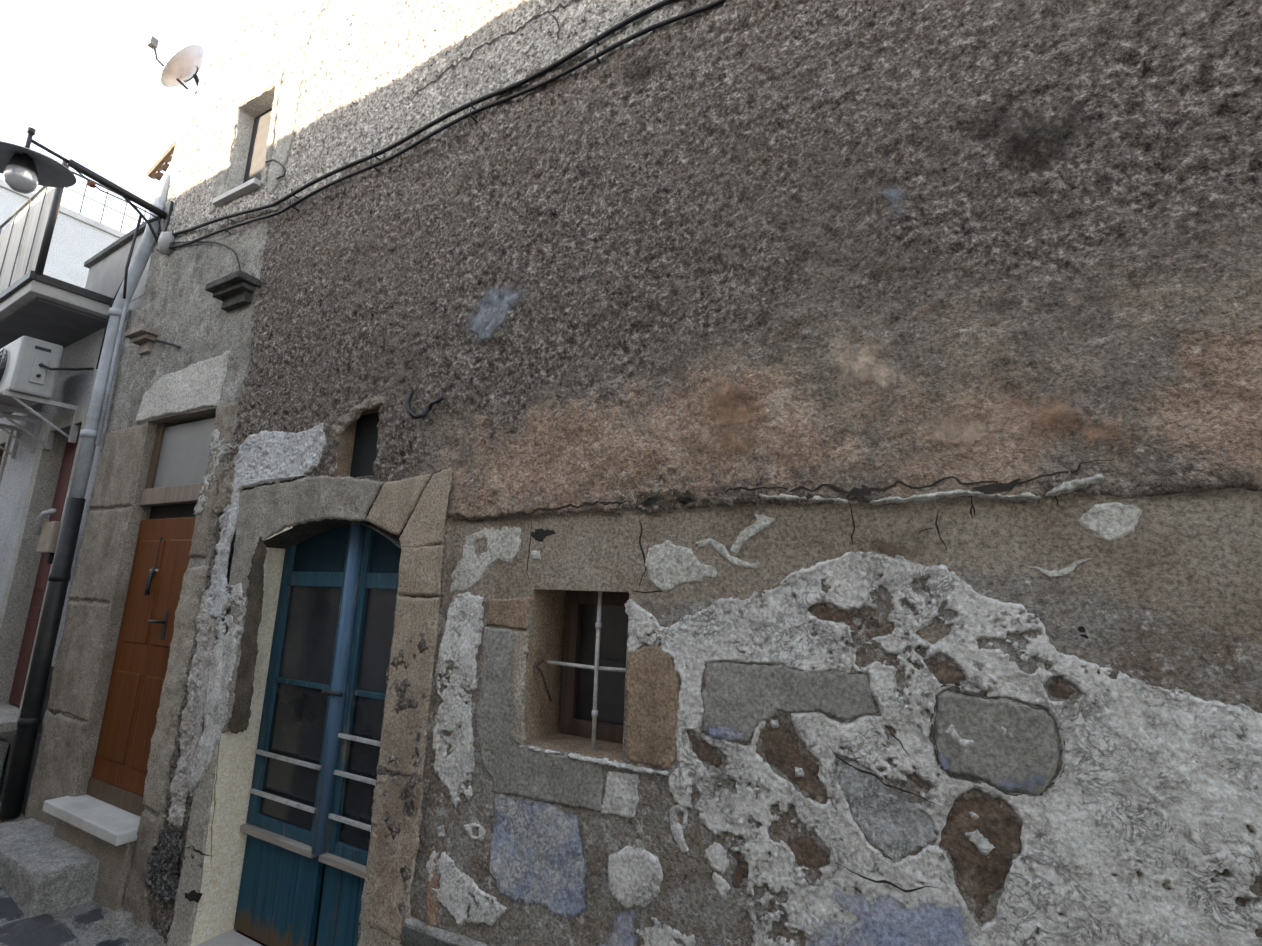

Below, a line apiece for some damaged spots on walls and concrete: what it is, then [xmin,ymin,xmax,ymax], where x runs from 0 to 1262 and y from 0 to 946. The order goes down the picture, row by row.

crack [458,500,662,593]
spalling [633,488,711,509]
flaking render [645,474,1104,592]
crack [706,459,1115,550]
flaking render [1078,502,1143,542]
flaking render [167,423,327,831]
flaking render [433,526,1262,946]
spalling [368,773,509,940]